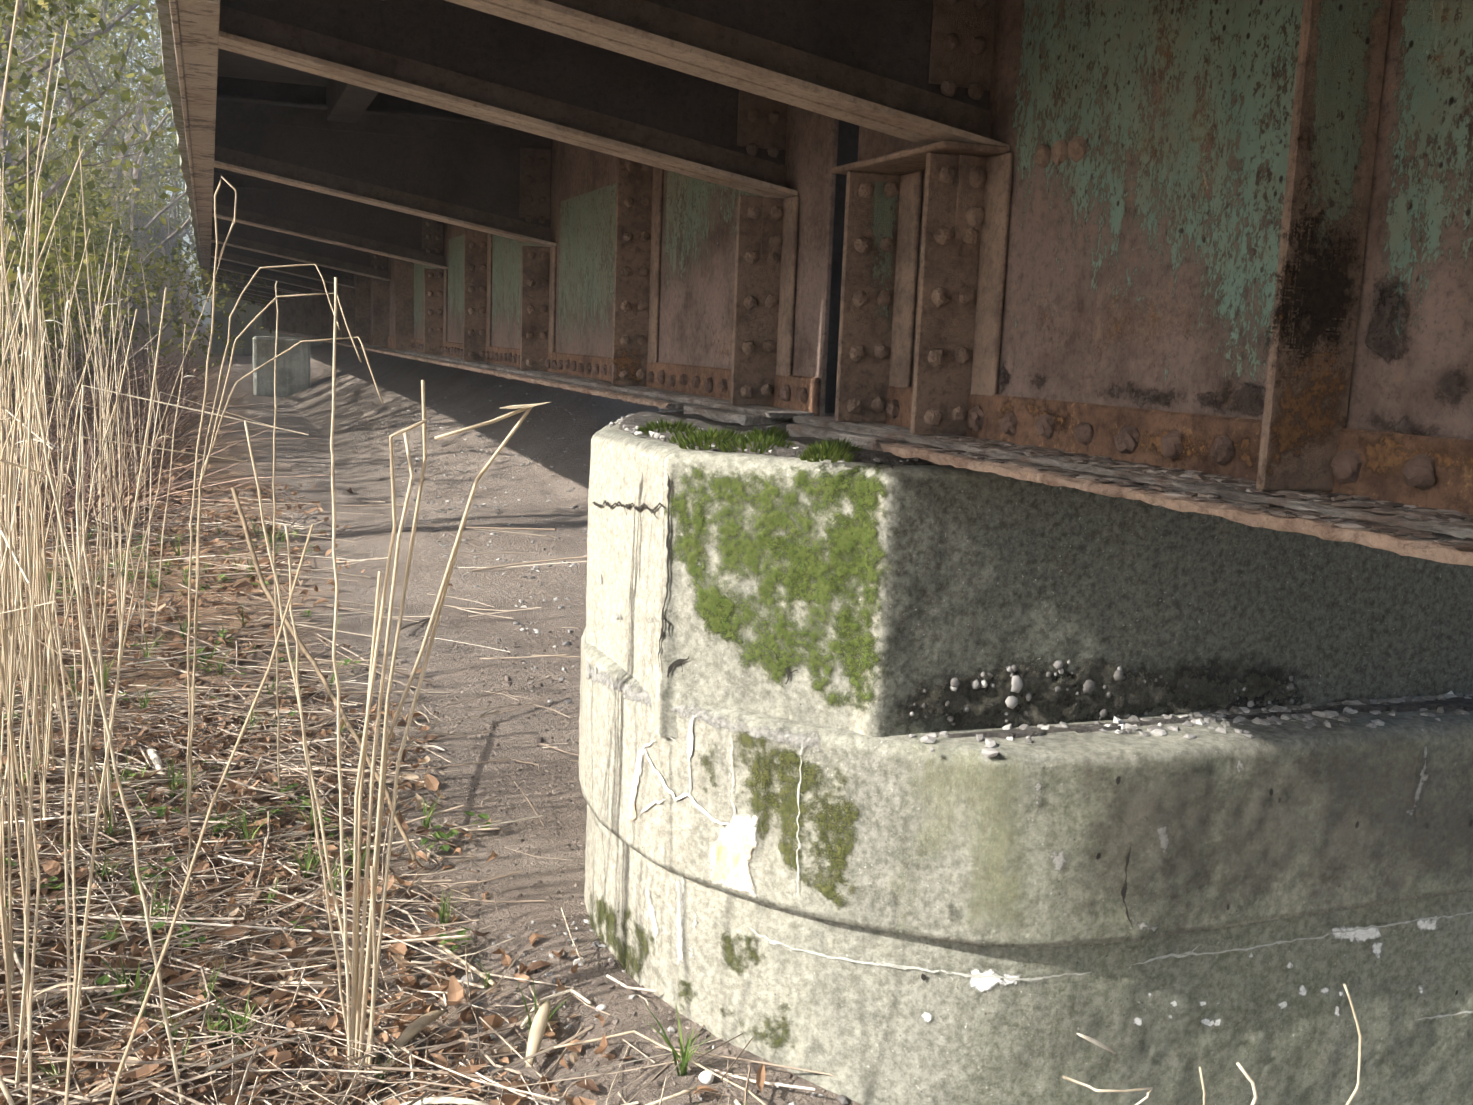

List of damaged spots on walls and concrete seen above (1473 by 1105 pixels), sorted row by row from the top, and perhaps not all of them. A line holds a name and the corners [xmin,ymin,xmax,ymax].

peeling [1012,0,1304,392]
rust [1265,165,1409,367]
peeling [1380,0,1473,337]
rust [1097,383,1175,407]
rust [1197,381,1265,416]
crack [593,473,689,678]
crack [641,716,735,825]
crack [796,738,804,894]